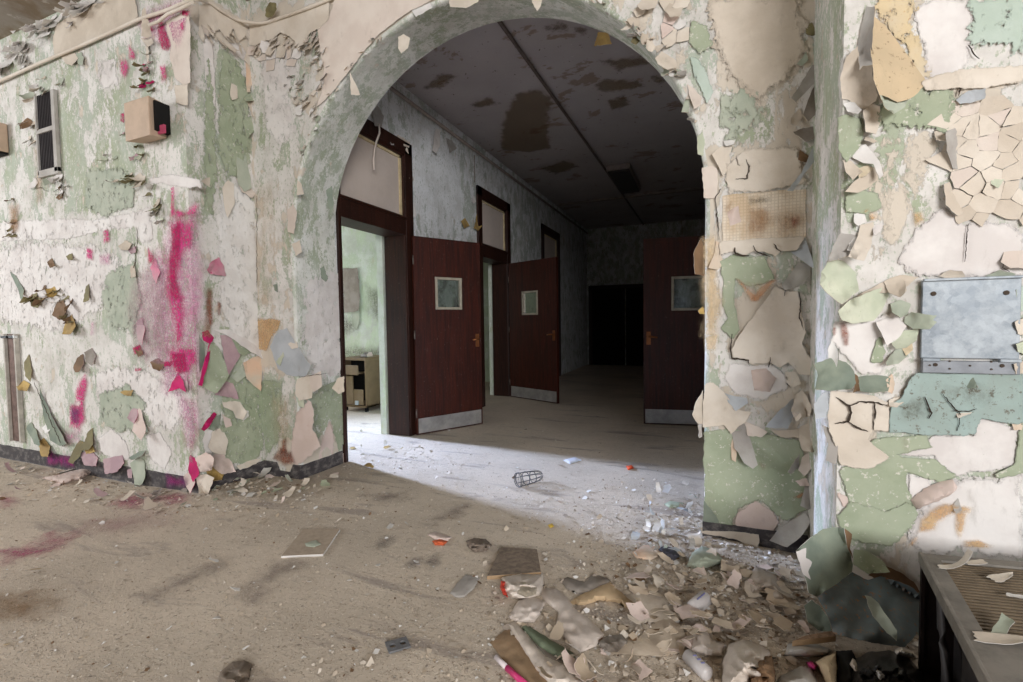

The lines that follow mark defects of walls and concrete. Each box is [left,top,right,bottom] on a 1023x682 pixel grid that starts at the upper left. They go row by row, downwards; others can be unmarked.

peeling [449,0,479,8]
spalling [501,91,552,152]
peeling [597,0,816,198]
peeling [461,196,482,231]
spalling [0,0,432,512]
peeling [692,0,1023,658]
crack [835,397,887,432]